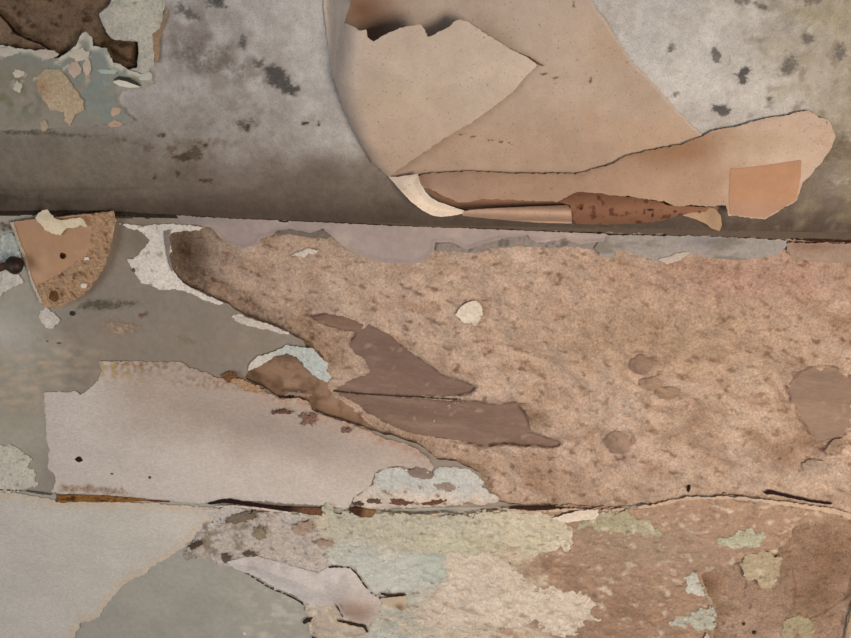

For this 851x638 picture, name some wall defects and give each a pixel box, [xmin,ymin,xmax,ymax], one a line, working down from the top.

peeling [0,232,25,296]
spalling [119,215,851,638]
crack [763,490,832,505]